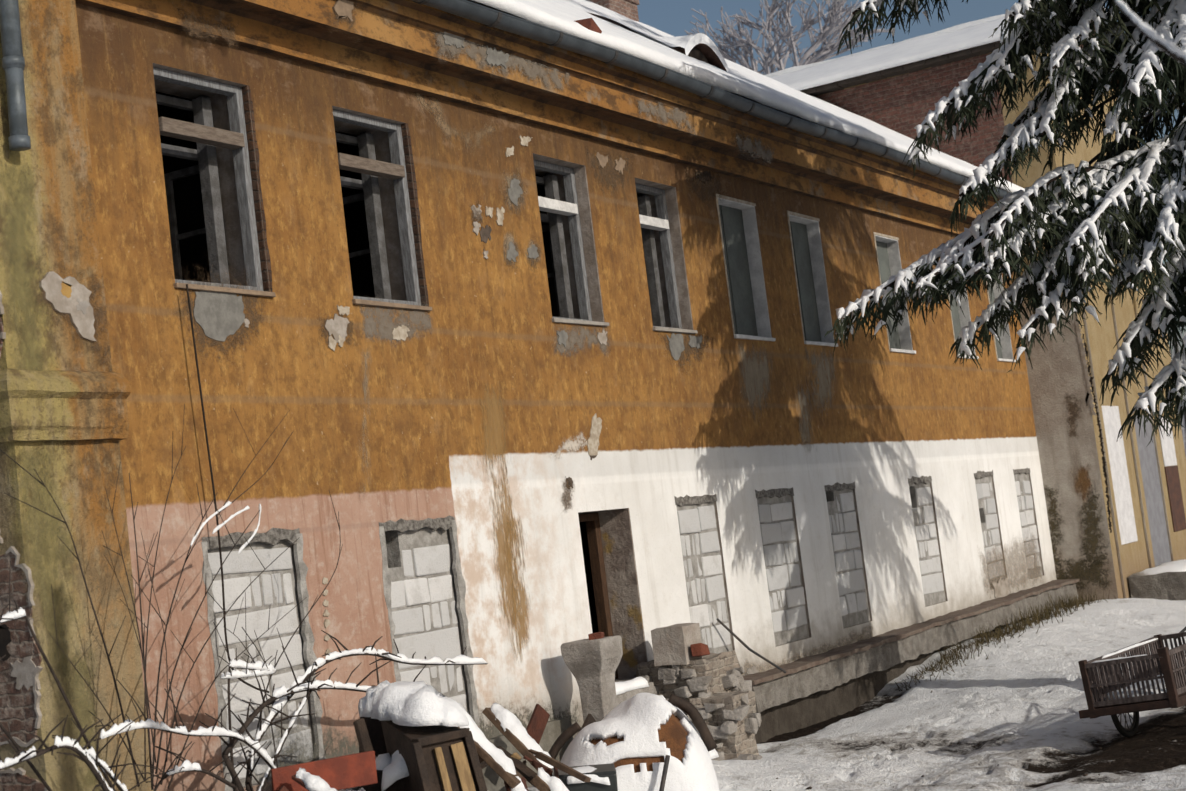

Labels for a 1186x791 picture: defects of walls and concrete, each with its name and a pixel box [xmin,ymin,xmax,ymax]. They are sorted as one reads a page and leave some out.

peeling [505,135,531,157]
peeling [471,204,505,259]
peeling [34,266,109,362]
peeling [321,305,431,351]
peeling [556,413,602,460]
flaking render [0,529,43,747]
flaking render [0,768,48,791]